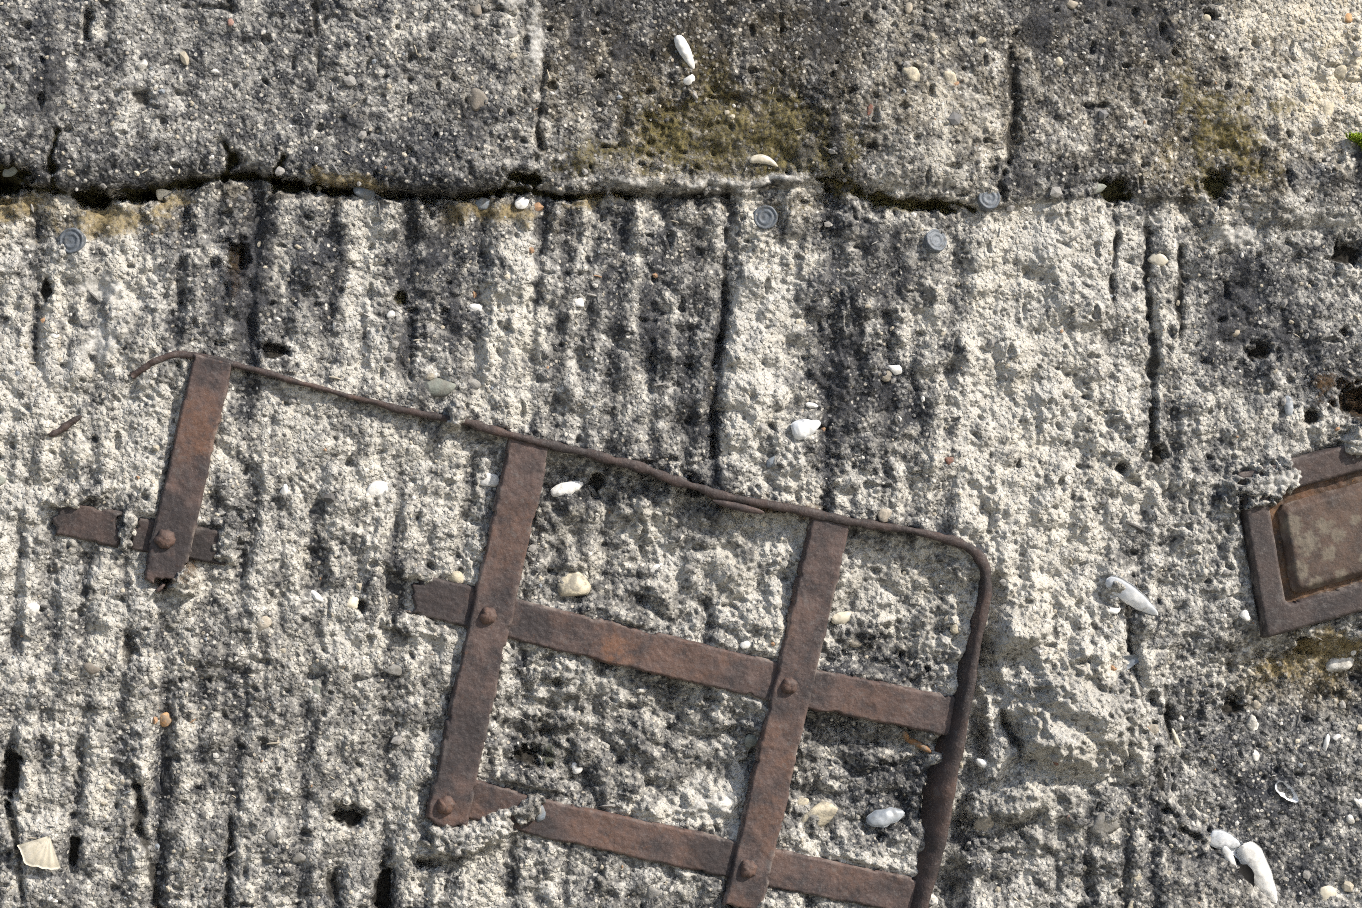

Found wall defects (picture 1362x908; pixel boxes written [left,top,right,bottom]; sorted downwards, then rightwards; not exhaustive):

crack [22,128,407,207]
crack [445,65,642,201]
damp [574,123,685,171]
damp [612,118,843,196]
damp [77,208,140,235]
damp [425,204,532,272]
damp [1208,227,1259,243]
damp [76,275,125,301]
damp [80,320,116,360]
rust [154,560,196,587]